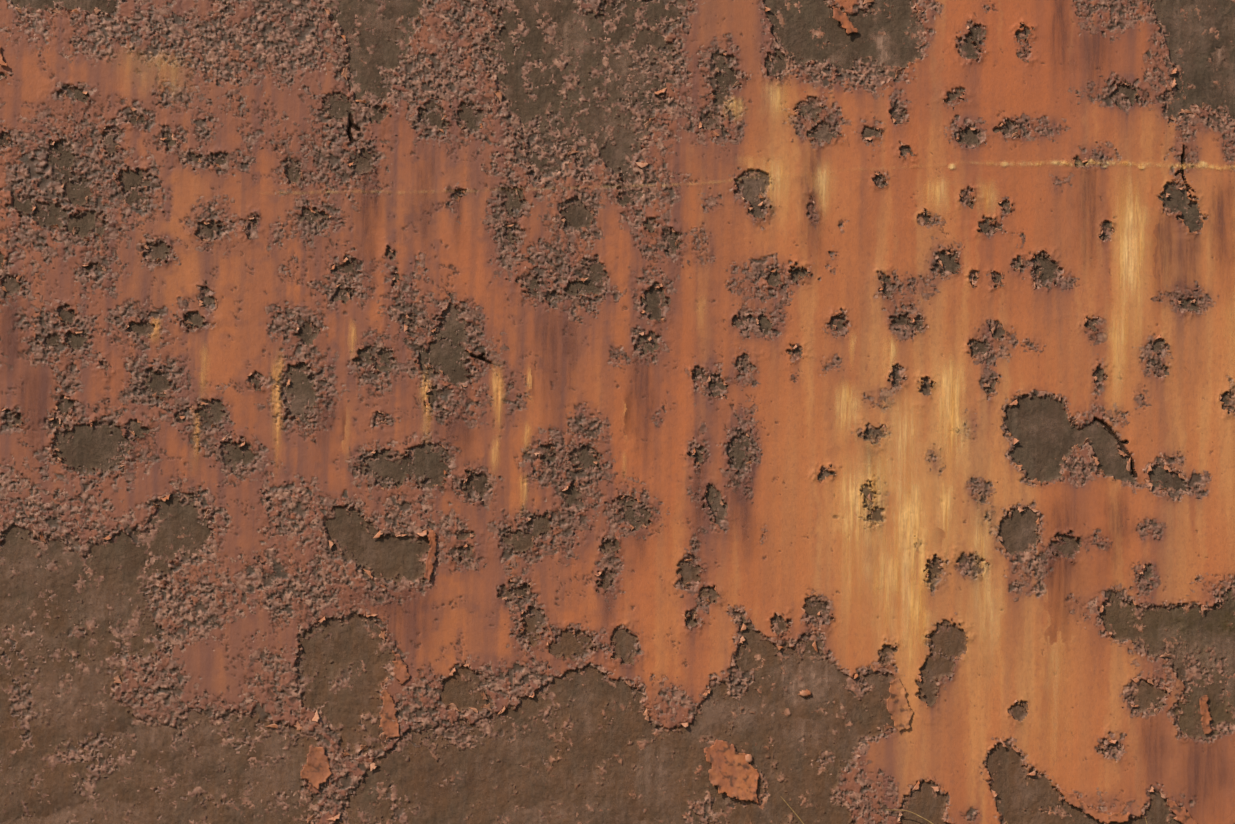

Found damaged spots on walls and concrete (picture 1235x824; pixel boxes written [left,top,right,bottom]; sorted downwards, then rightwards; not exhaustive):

corrosion [0,81,275,495]
peeling [0,0,705,232]
corrosion [246,91,687,665]
peeling [0,455,1198,824]
corrosion [685,253,821,538]
peeling [752,0,944,100]
corrosion [818,464,991,708]
crack [1036,159,1144,169]
peeling [978,389,1213,602]
crack [1093,418,1138,478]
peeling [1067,572,1235,744]
crack [1175,145,1235,199]